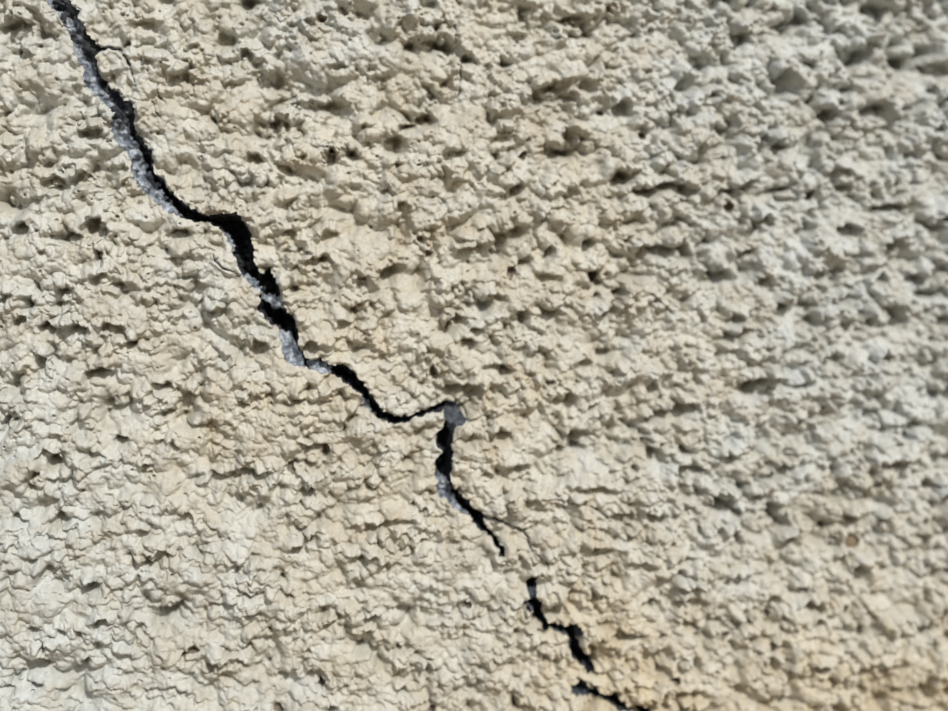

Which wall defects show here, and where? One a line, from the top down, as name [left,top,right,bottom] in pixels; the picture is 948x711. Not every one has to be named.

crack [46,0,649,711]